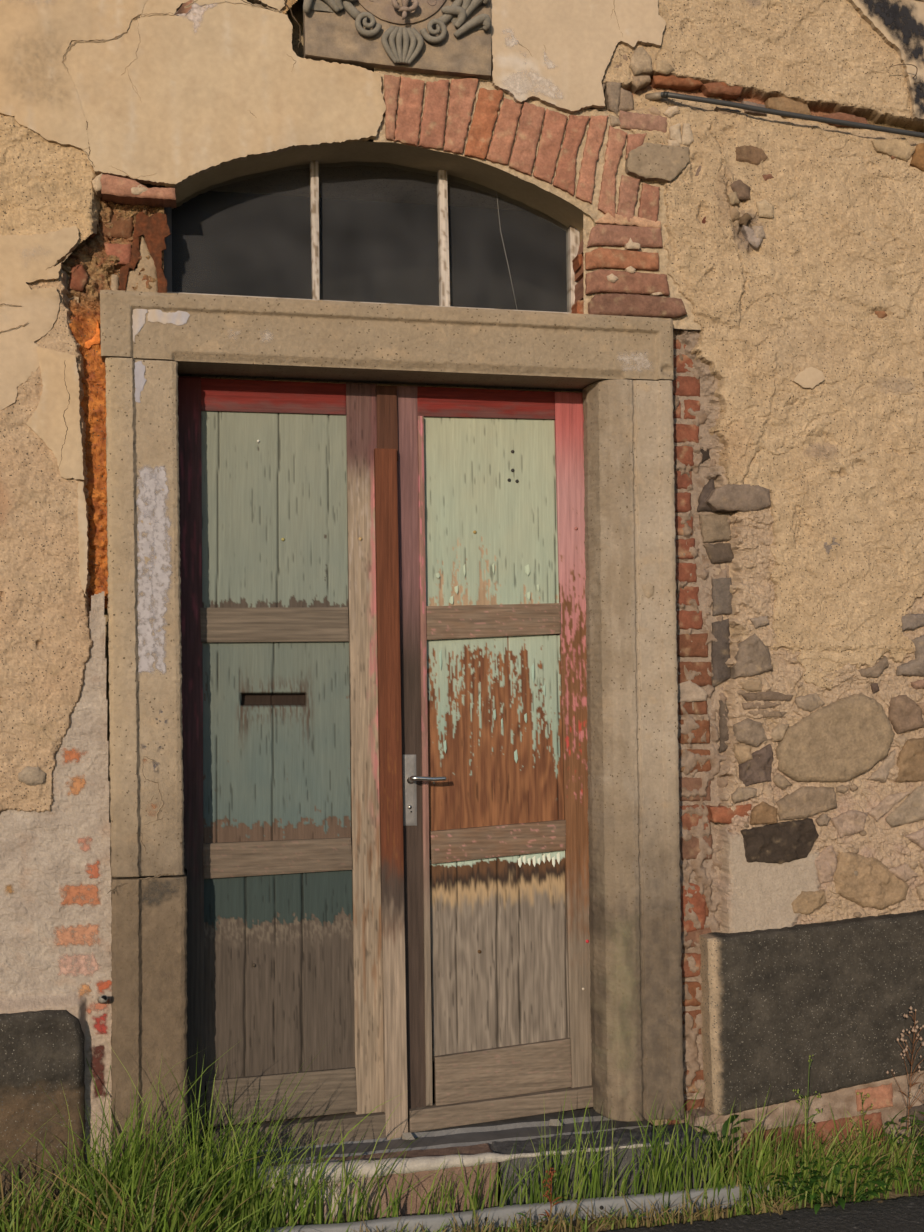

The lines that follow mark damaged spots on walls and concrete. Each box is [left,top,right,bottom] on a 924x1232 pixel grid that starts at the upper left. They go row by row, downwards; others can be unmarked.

crack [63,0,198,101]
crack [241,0,301,72]
crack [84,119,157,179]
crack [0,303,28,333]
peeling [132,309,190,342]
peeling [136,466,171,673]
spalling [374,0,924,1125]
spalling [0,114,164,1175]